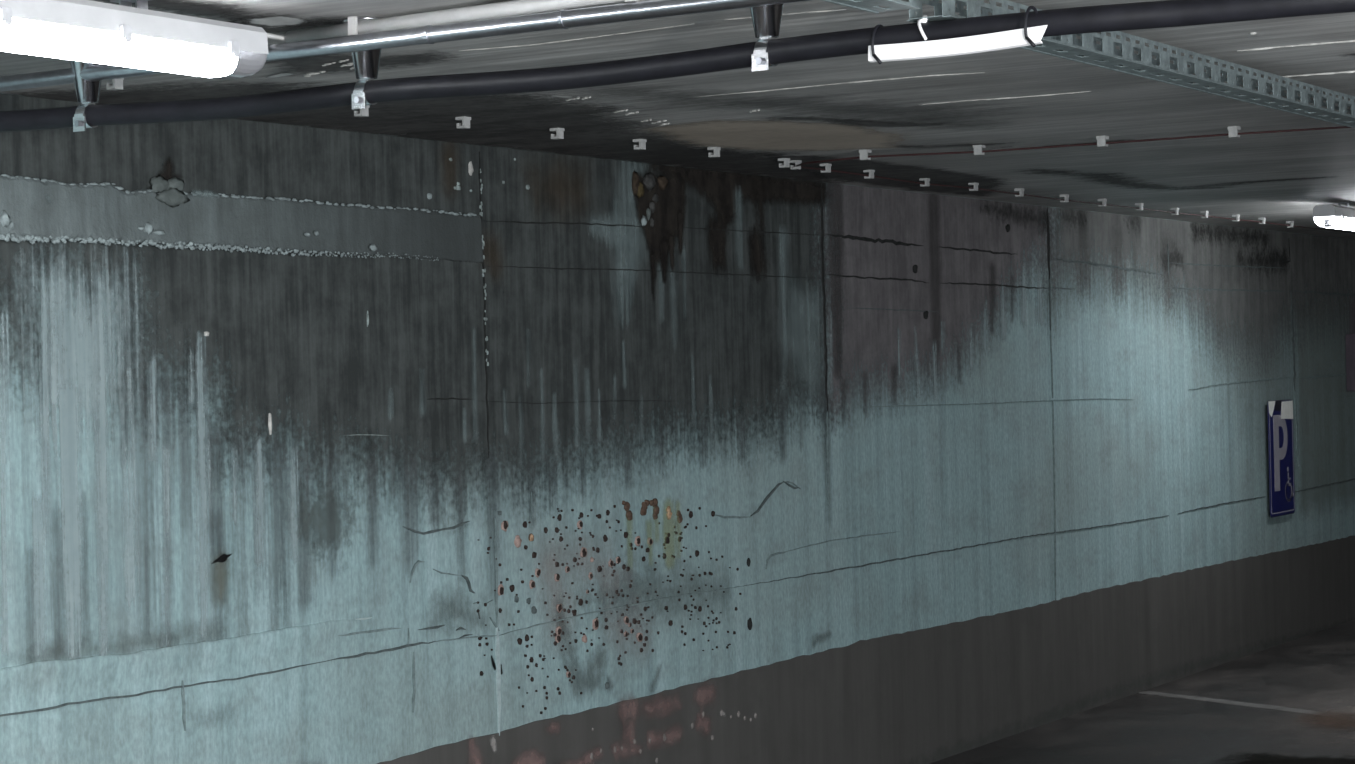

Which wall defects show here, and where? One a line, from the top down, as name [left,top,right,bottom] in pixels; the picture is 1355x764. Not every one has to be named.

water stain [0,93,99,111]
spalling [149,159,190,208]
peeling [453,161,474,192]
water stain [0,119,1355,657]
rust [476,498,742,714]
crack [0,478,1355,717]